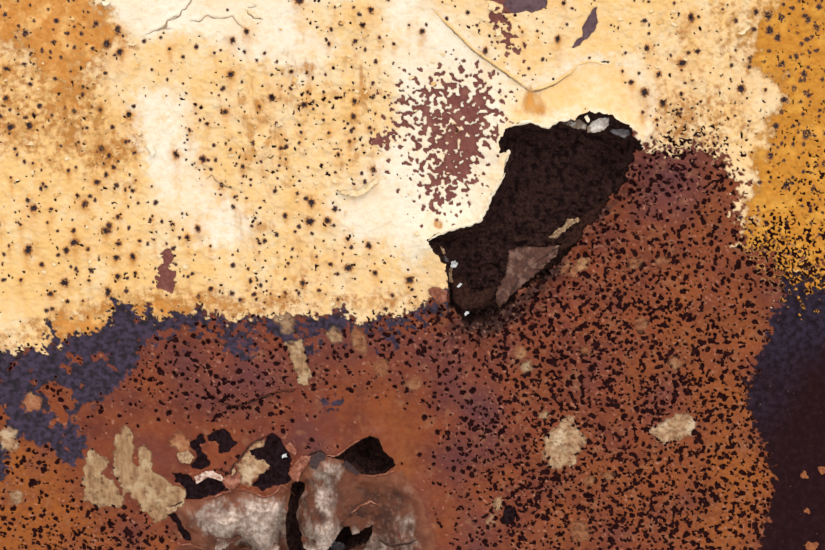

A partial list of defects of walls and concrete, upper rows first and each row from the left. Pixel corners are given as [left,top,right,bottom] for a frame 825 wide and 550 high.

crack [146,0,261,35]
crack [432,8,604,93]
rust [0,0,136,168]
rust [665,96,734,145]
rust [722,0,825,320]
rust [29,289,245,341]
rust [257,292,295,313]